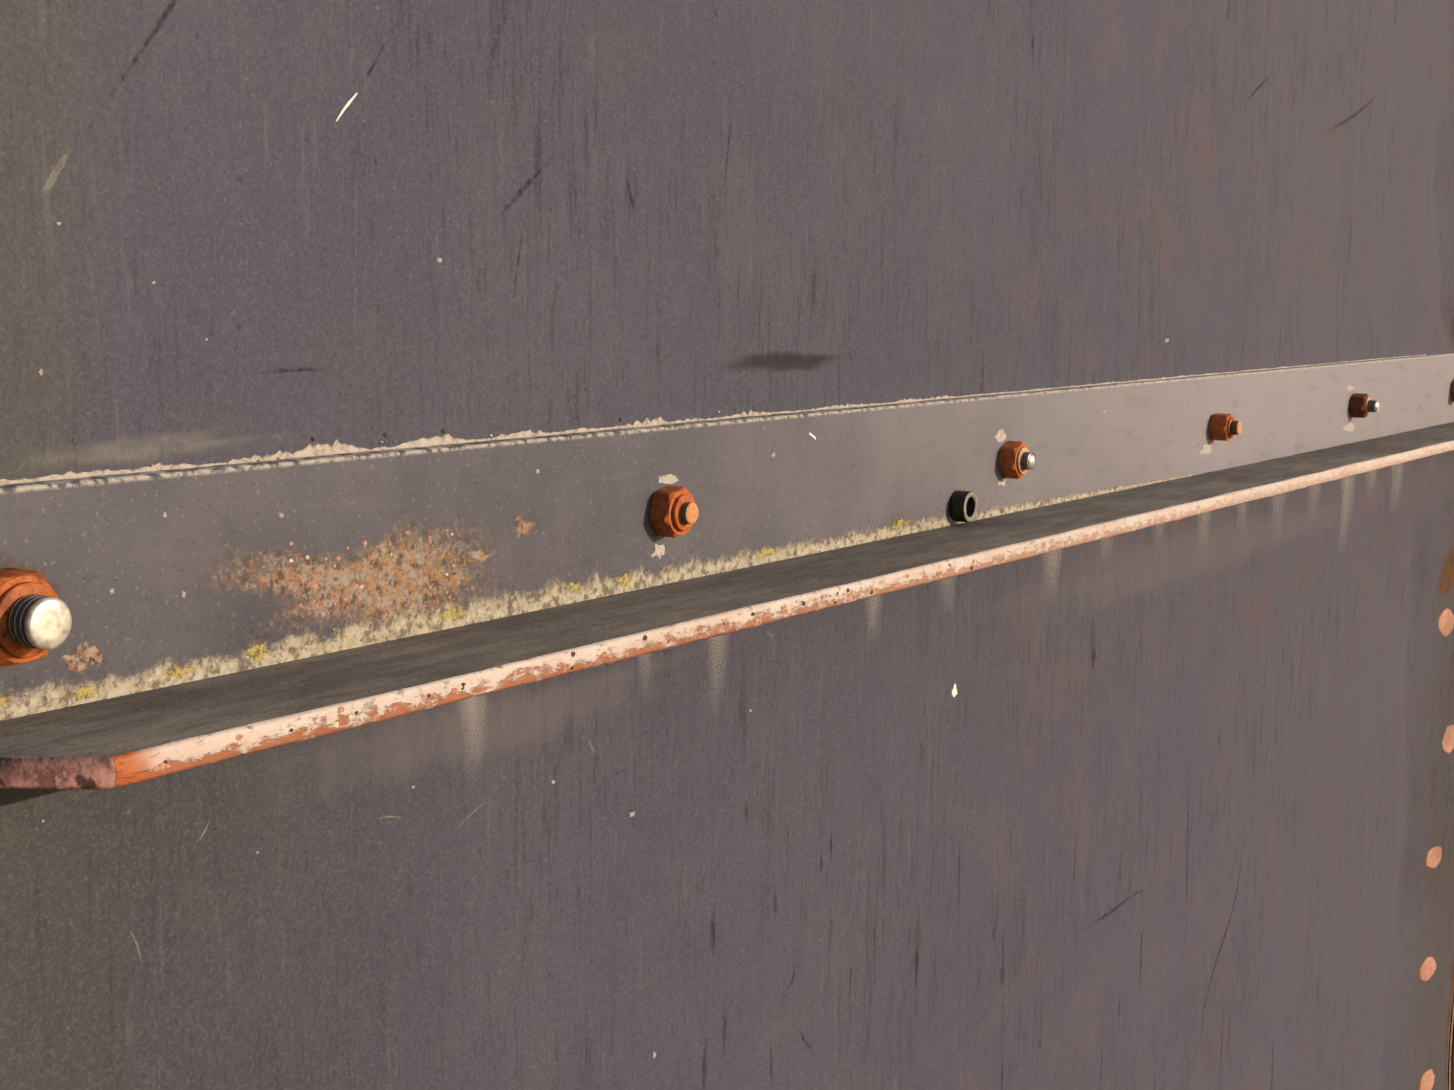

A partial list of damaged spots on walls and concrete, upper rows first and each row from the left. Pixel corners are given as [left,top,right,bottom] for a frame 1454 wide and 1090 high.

rust [515,516,533,536]
rust [219,526,490,633]
rust [62,643,103,671]